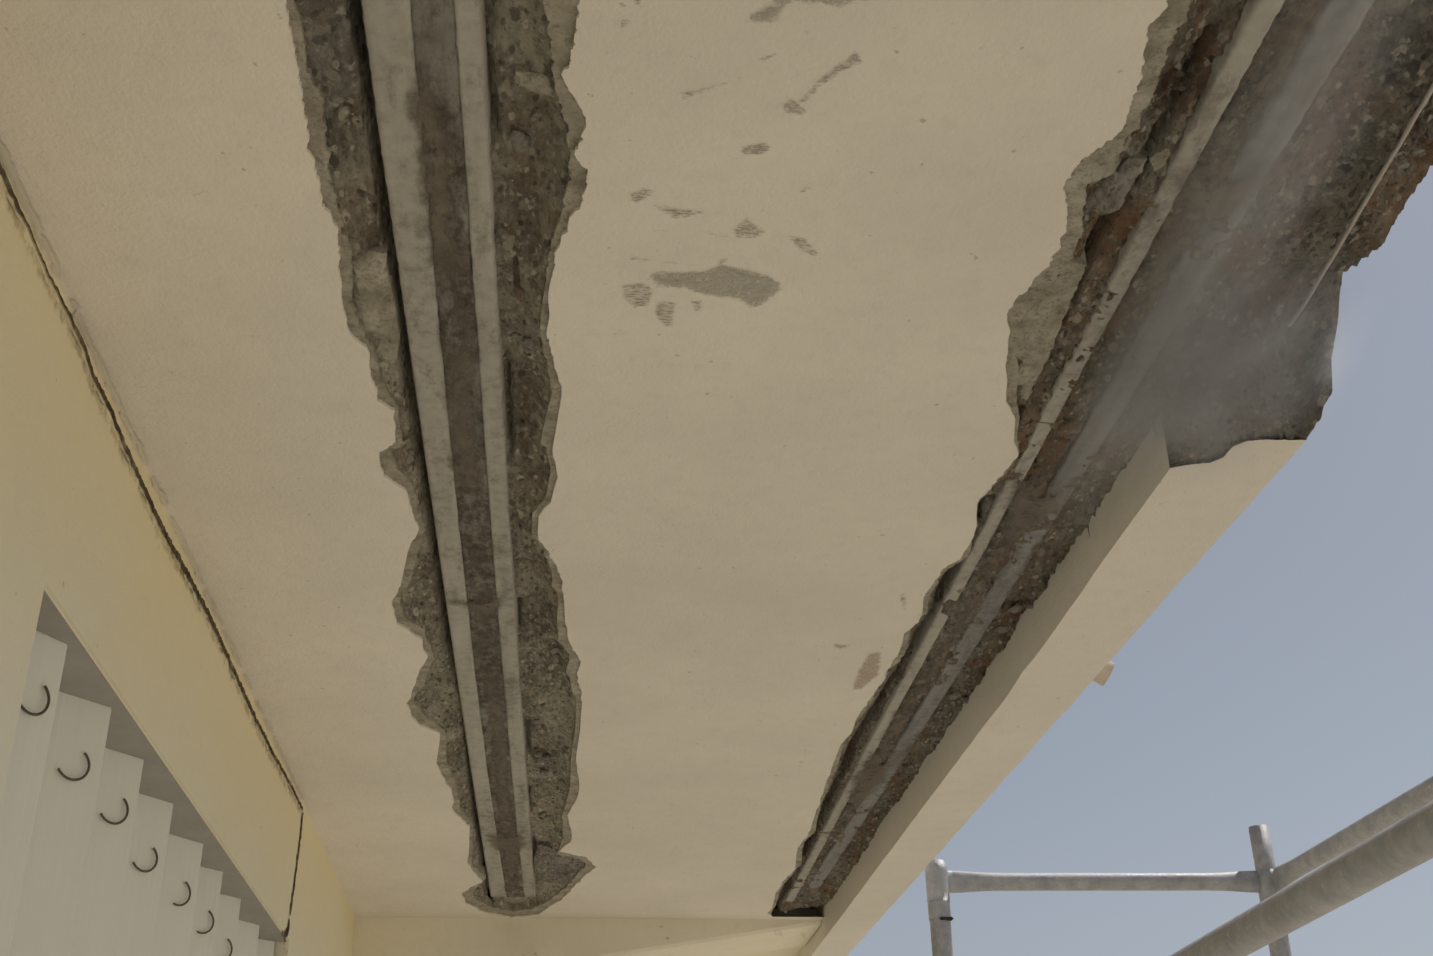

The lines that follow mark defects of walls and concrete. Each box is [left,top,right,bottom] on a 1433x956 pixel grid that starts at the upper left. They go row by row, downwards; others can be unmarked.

spalling [286,0,595,916]
peeling [651,266,778,306]
peeling [751,0,850,22]
spalling [768,0,1433,914]